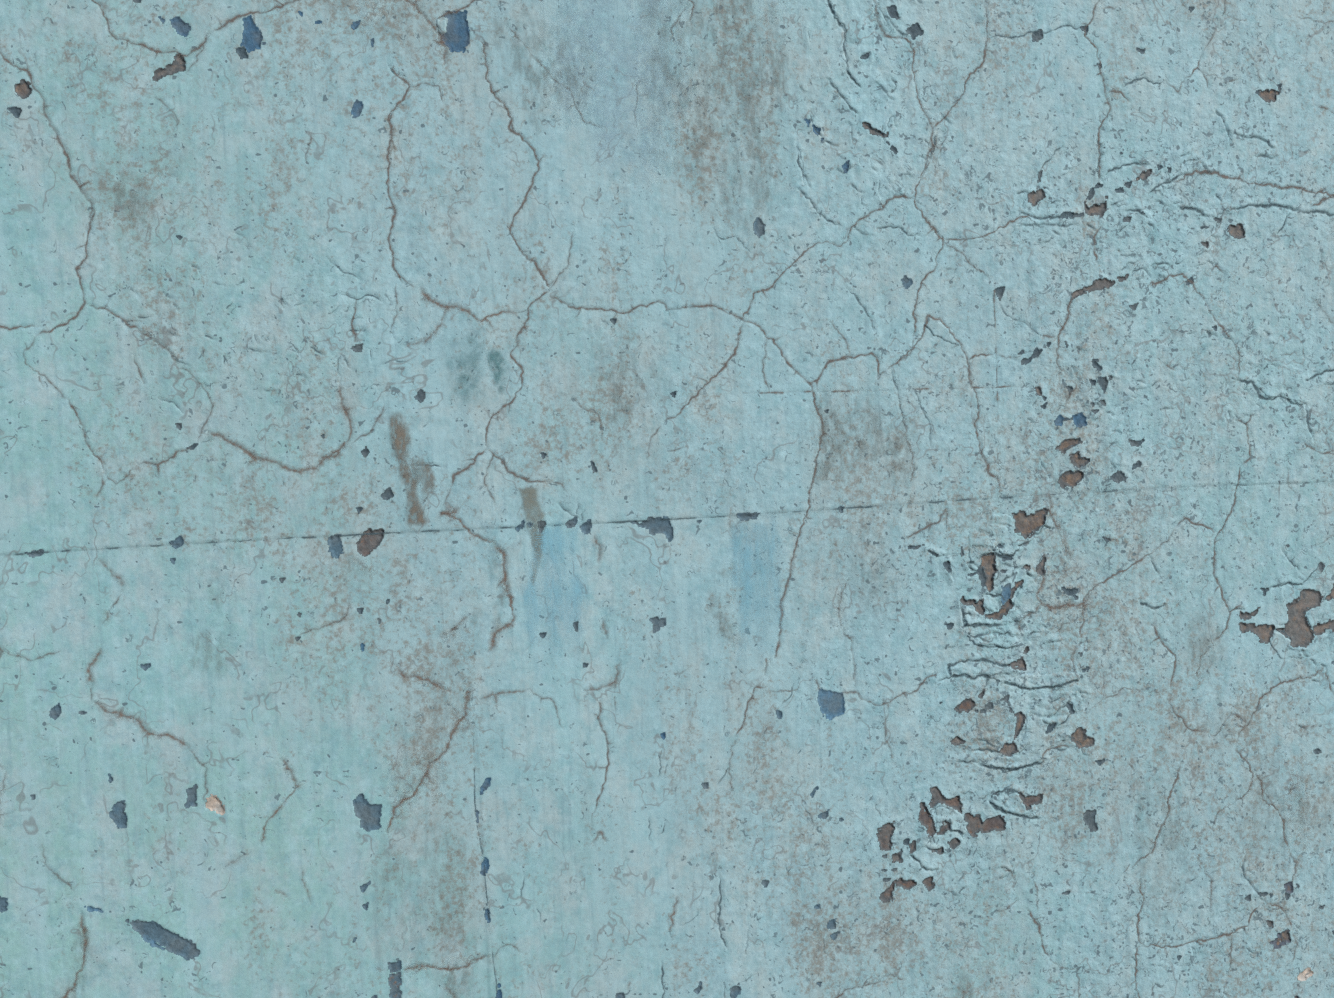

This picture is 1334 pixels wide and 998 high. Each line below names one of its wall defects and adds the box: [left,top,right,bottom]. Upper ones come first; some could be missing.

crack [92,0,296,61]
crack [0,55,164,378]
crack [176,0,1334,878]
spalling [1035,359,1113,489]
spalling [960,543,1046,620]
spalling [1239,584,1334,648]
crack [87,653,208,792]
spalling [940,689,1026,757]
peeling [125,919,200,961]
crack [407,768,509,988]
spalling [876,786,1006,903]
crack [1128,769,1307,998]